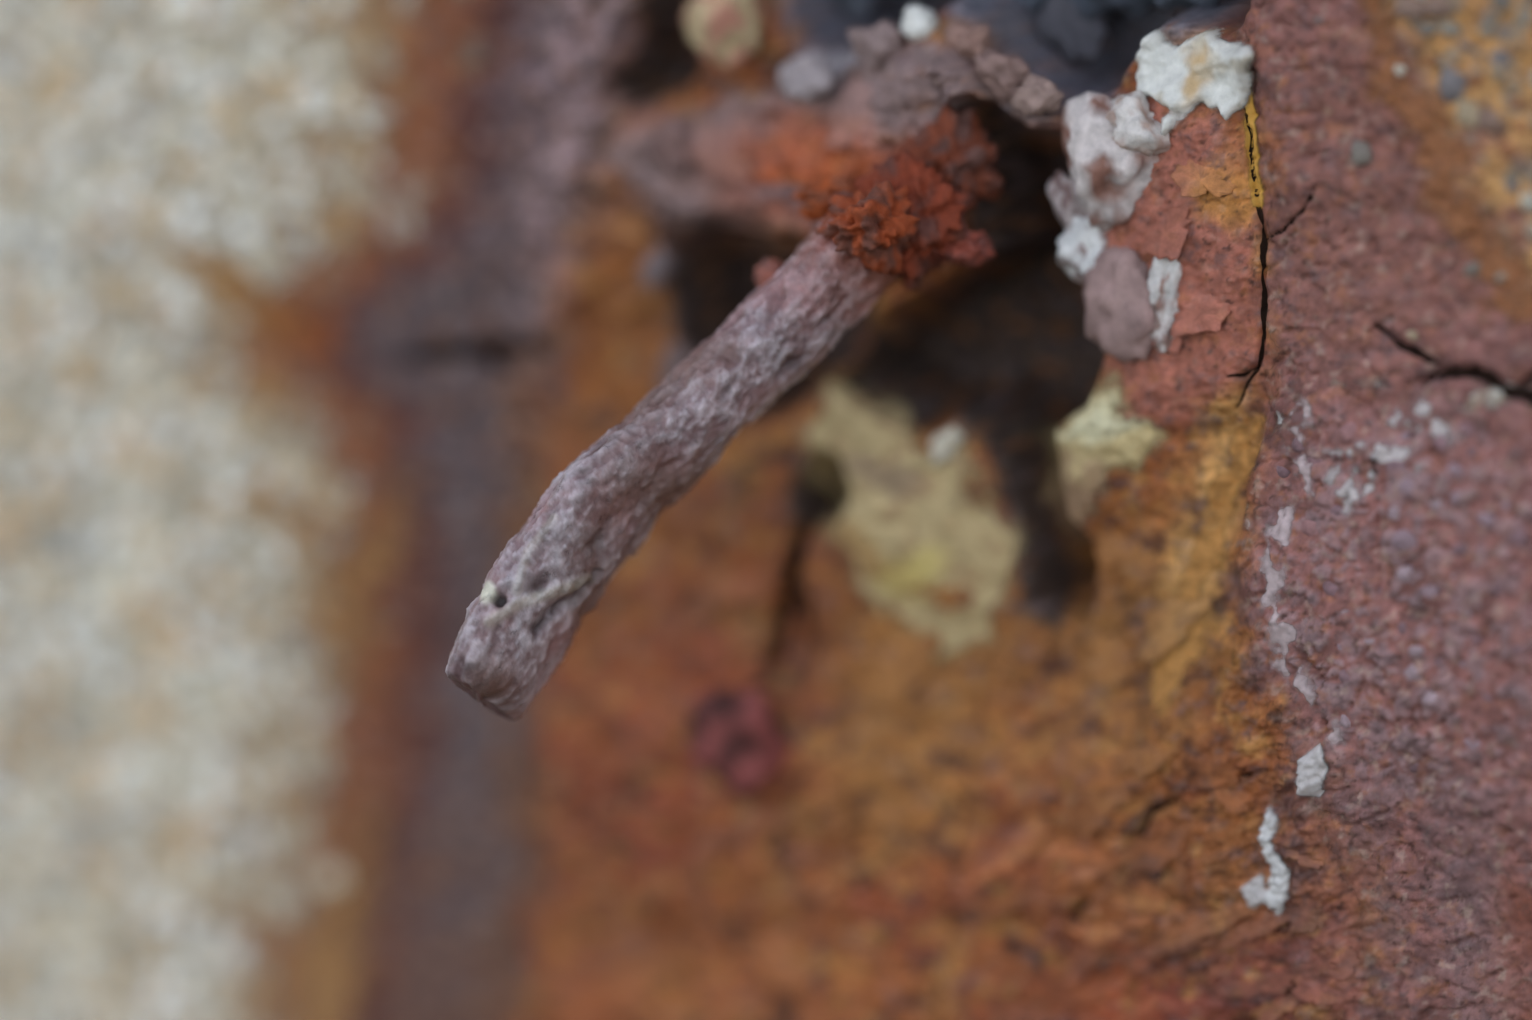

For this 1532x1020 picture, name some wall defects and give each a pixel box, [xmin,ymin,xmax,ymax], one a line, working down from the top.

corrosion [892,105,1004,208]
corrosion [753,259,785,287]
corrosion [791,173,921,275]
corrosion [930,229,997,267]
corrosion [1243,0,1532,417]
spalling [512,0,1280,710]
crack [1373,324,1532,405]
corrosion [168,0,651,1020]
corrosion [498,626,1532,1020]